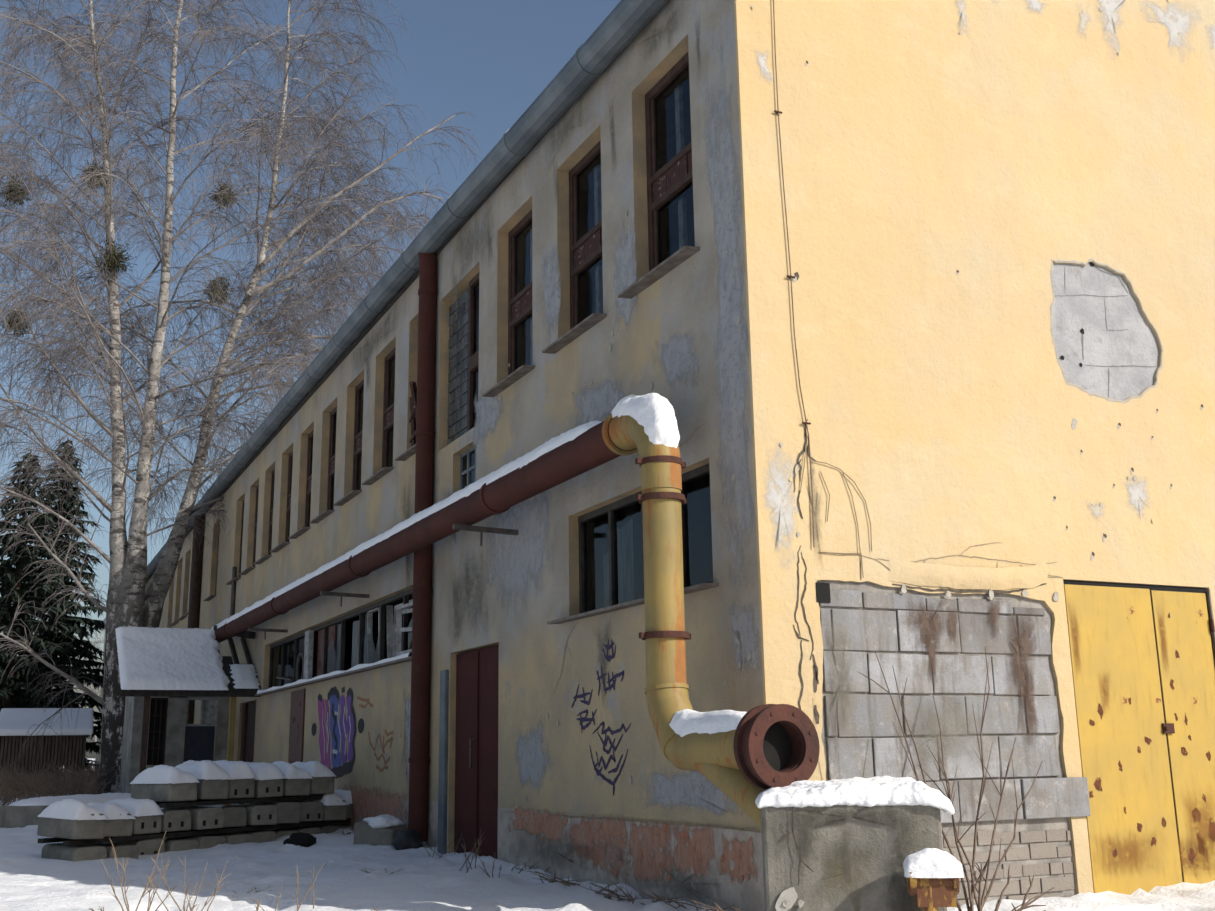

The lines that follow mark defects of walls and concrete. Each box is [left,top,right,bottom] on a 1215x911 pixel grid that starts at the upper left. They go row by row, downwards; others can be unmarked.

peeling [1079,0,1125,55]
peeling [1148,0,1194,47]
spalling [1050,258,1164,404]
peeling [1113,467,1146,511]
spalling [815,582,831,603]
crack [793,419,1063,724]
corrosion [1159,613,1180,658]
corrosion [1089,686,1107,726]
peeling [652,771,757,882]
corrosion [1113,817,1166,863]
corrosion [1179,794,1215,868]